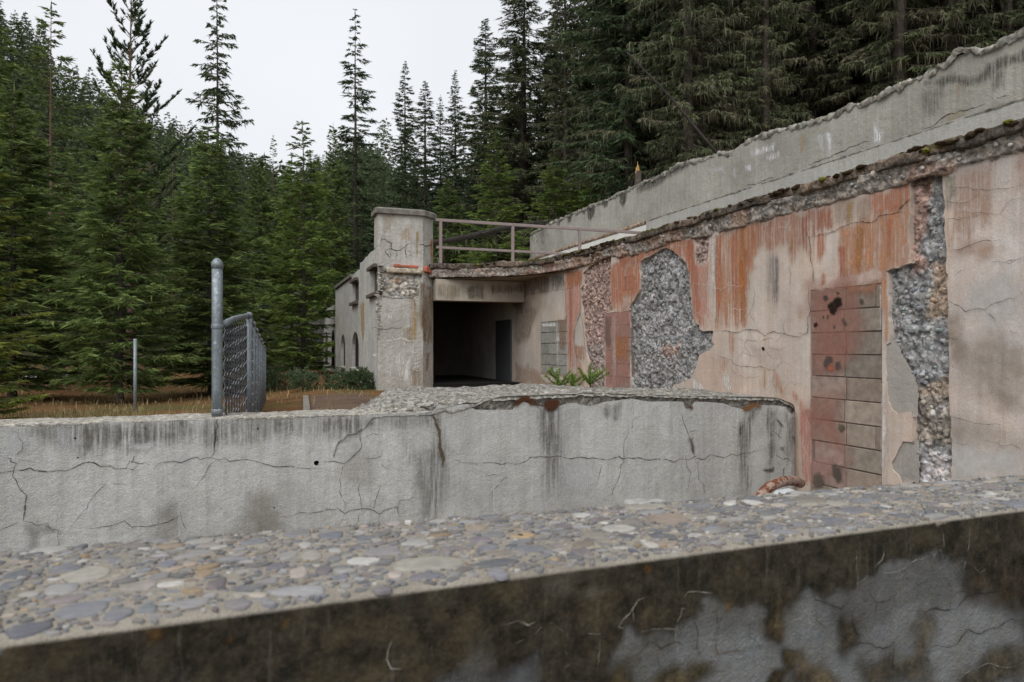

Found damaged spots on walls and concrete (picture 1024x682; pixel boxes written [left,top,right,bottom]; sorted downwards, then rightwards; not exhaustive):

crack [948,186,1019,273]
spalling [375,131,1024,484]
rust [605,184,909,383]
crack [1,420,413,542]
crack [432,415,445,465]
rust [515,396,560,411]
crack [484,416,795,494]